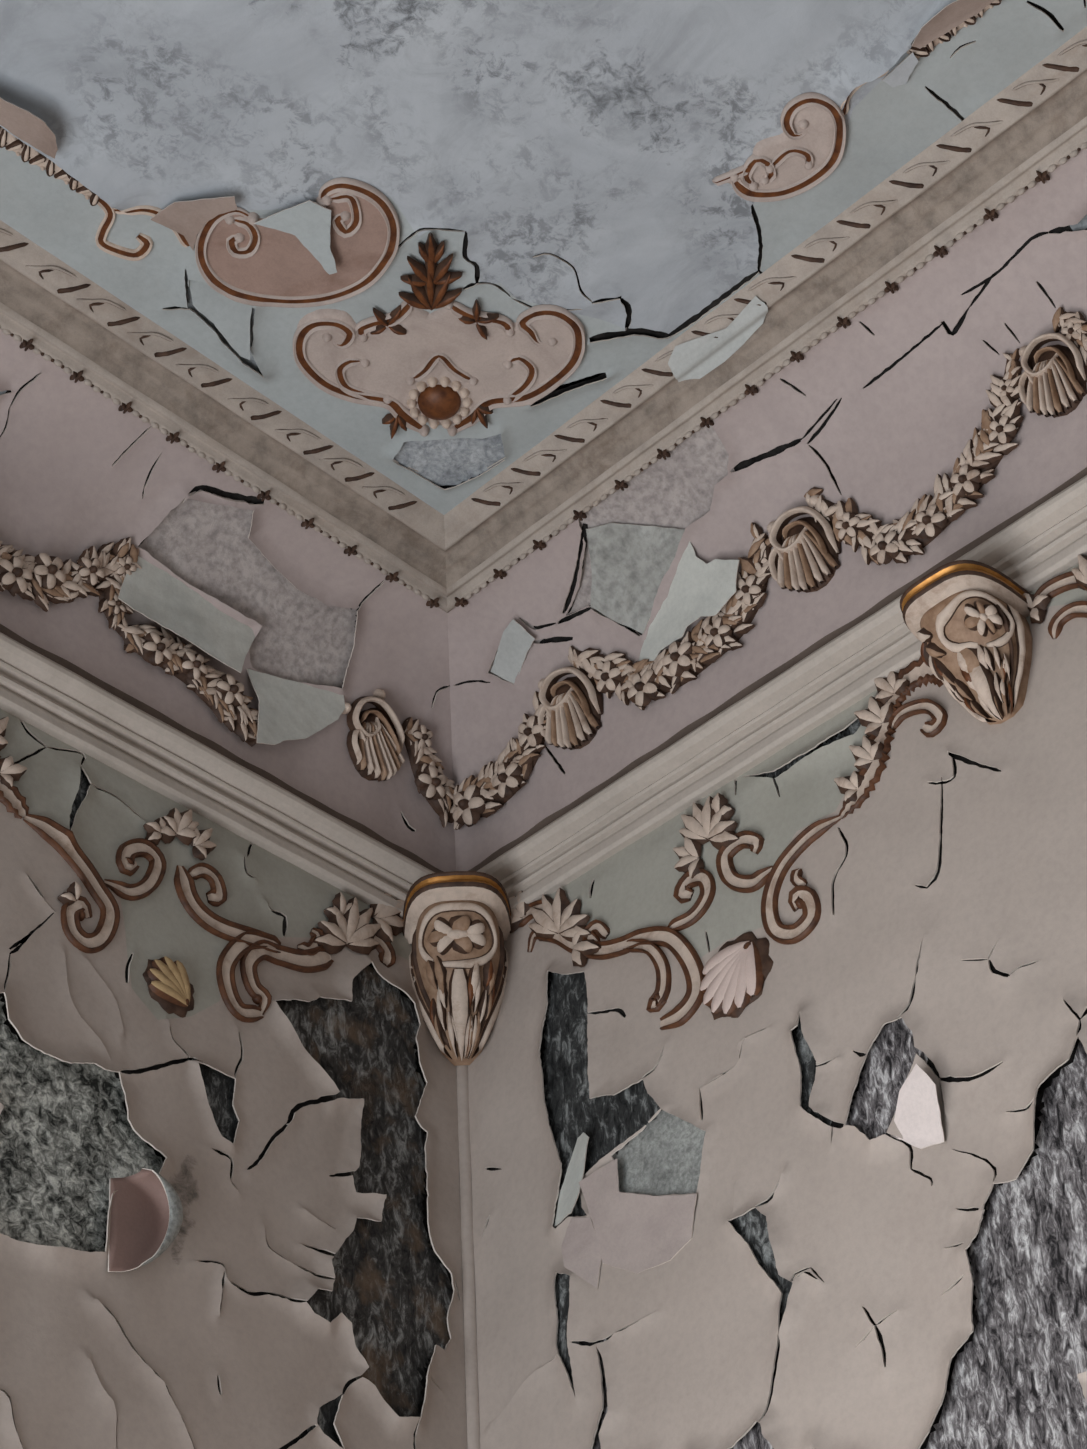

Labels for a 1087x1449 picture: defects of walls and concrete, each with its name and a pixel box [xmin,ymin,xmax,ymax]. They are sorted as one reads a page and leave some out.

crack [535,204,763,339]
crack [734,225,1087,495]
peeling [118,478,370,745]
crack [534,523,642,644]
peeling [480,413,748,696]
crack [723,690,878,803]
peeling [0,976,183,1282]
peeling [264,952,463,1449]
crack [543,1255,628,1421]
peeling [531,956,719,1289]
crack [780,995,868,1139]
peeling [581,999,1087,1449]